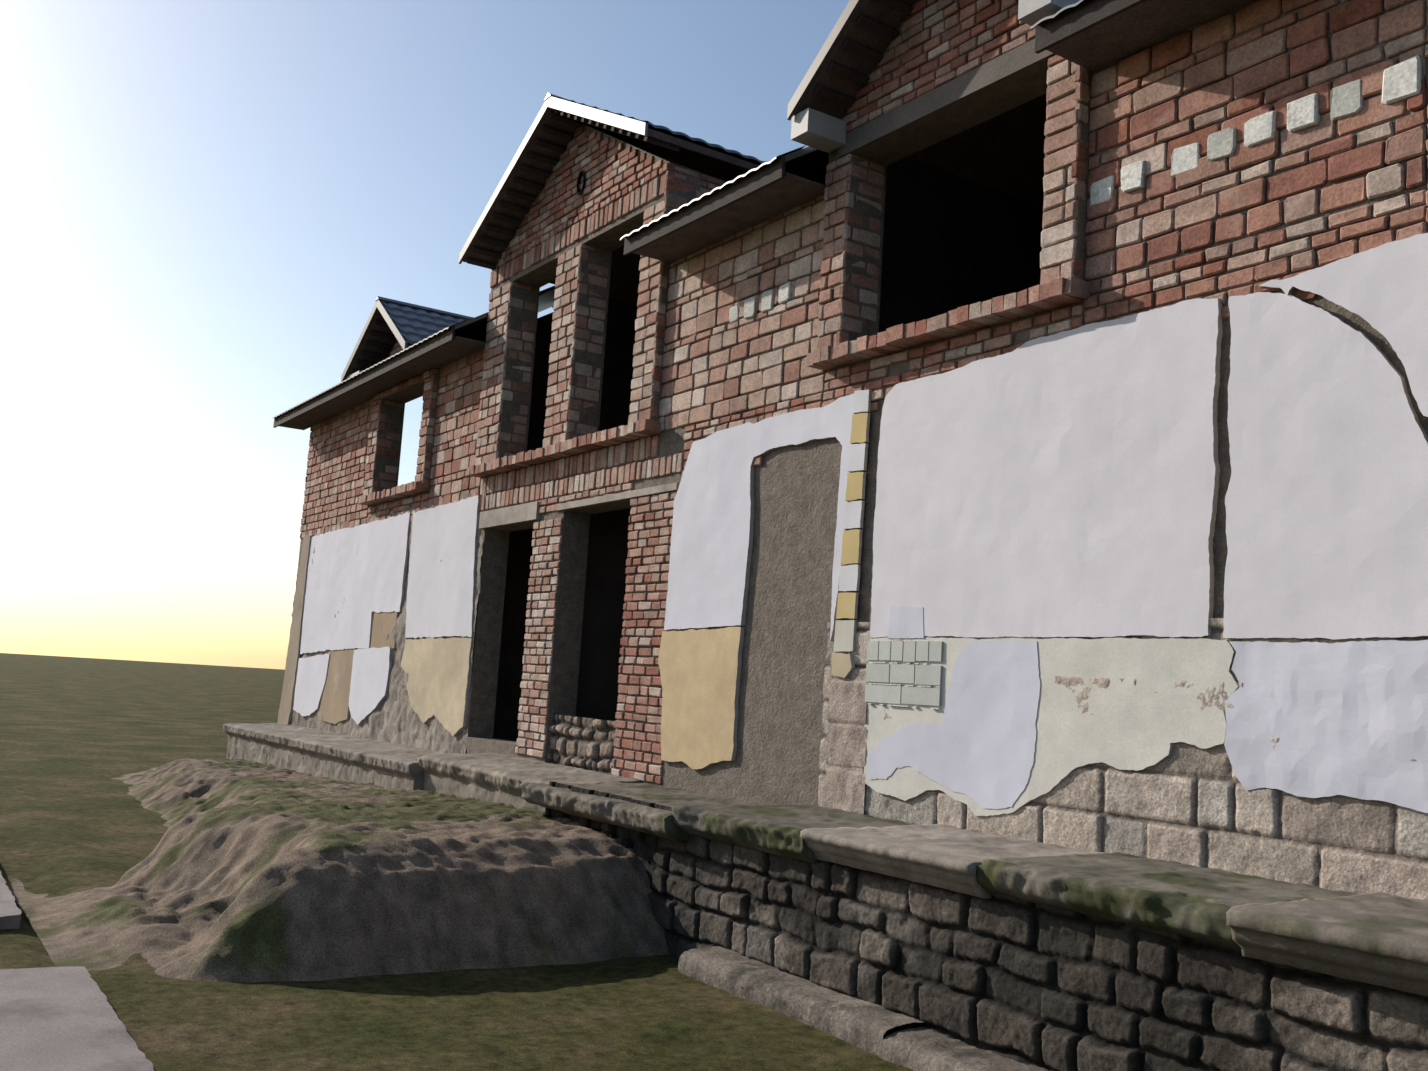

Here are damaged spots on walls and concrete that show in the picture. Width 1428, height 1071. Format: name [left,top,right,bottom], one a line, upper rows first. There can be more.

flaking render [318,611,398,724]